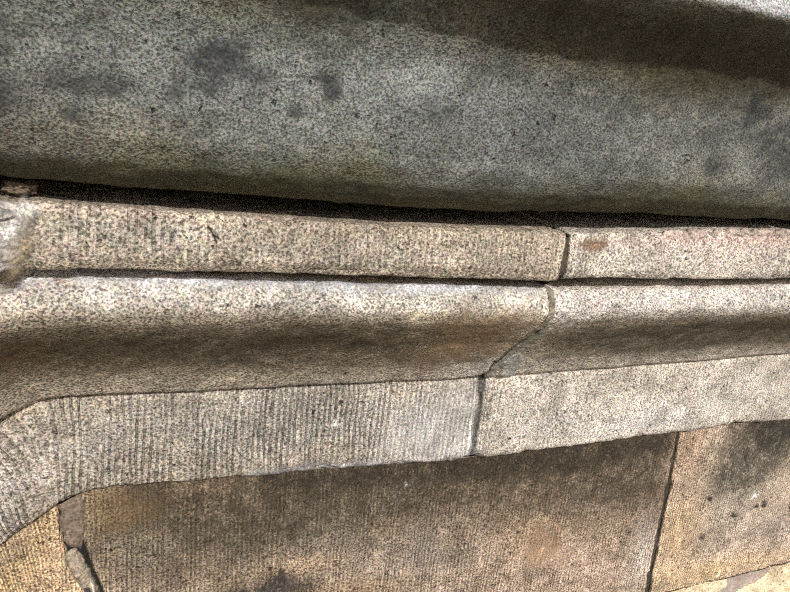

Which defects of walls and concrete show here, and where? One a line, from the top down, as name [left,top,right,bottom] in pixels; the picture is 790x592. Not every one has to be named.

water stain [247,570,298,592]